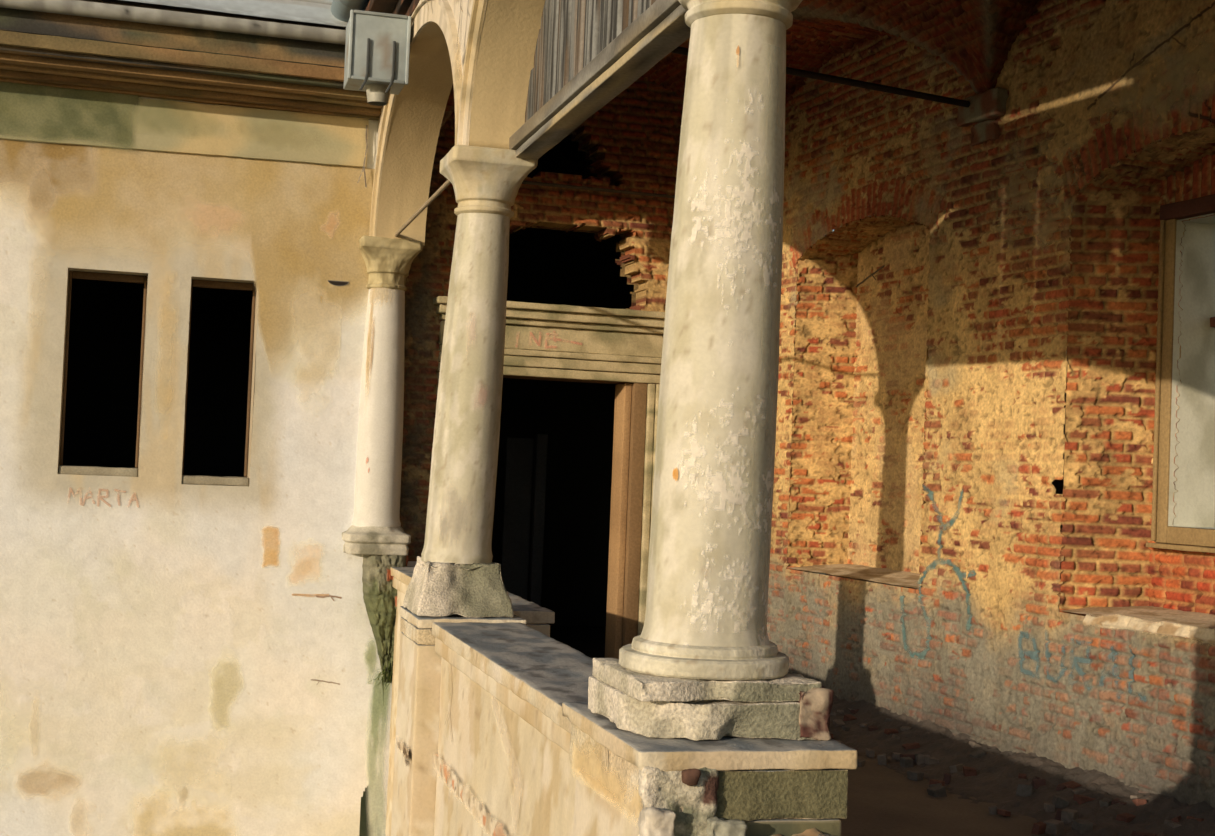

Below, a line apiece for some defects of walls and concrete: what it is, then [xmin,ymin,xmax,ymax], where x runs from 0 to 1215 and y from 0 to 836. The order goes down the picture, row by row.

damp [0,82,391,384]
peeling [688,61,783,370]
flaking render [263,527,280,567]
flaking render [292,560,329,597]
peeling [683,383,774,646]
damp [365,642,376,683]
spalling [1083,614,1215,644]
spalling [638,766,747,836]